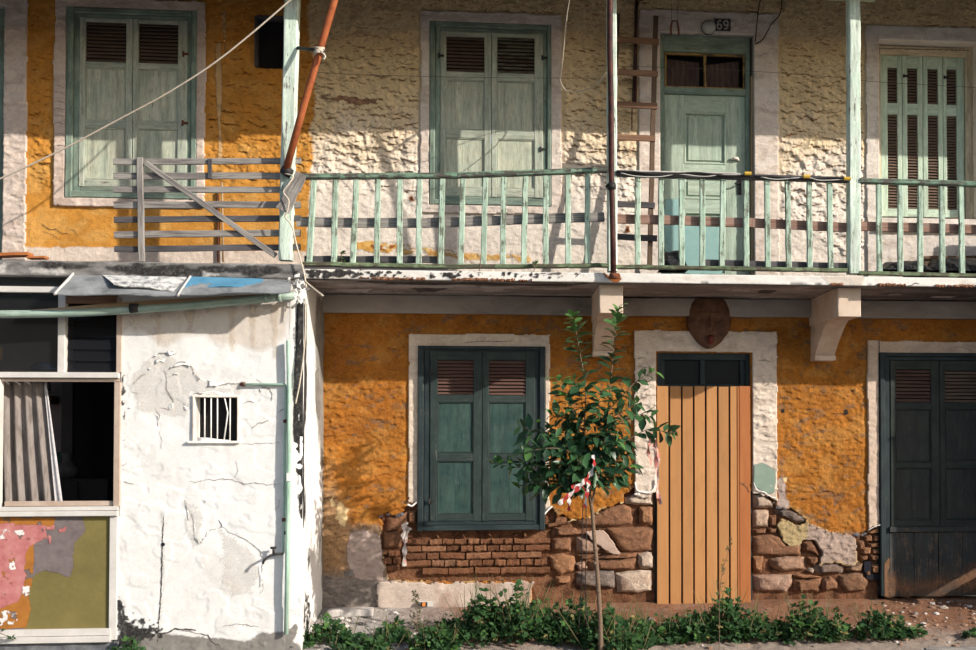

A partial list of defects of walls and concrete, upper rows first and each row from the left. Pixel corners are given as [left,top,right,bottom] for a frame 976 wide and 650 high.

peeling [133,350,242,419]
damp [293,296,325,588]
peeling [0,516,85,630]
crack [157,516,258,647]
flaking render [330,482,656,593]
flaking render [752,463,879,593]